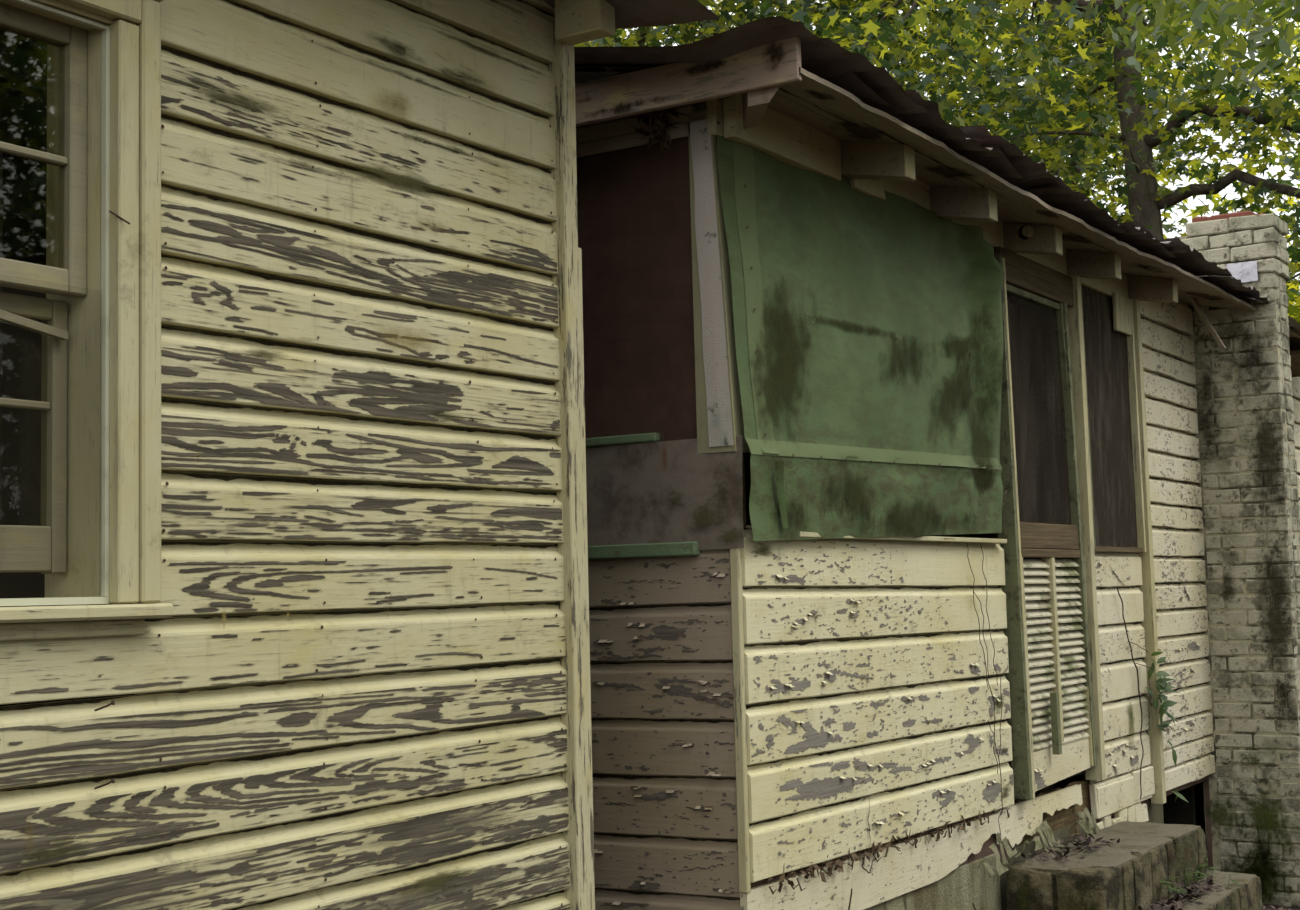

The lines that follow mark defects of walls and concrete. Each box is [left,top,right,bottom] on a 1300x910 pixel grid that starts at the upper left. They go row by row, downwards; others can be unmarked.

peeling [161,62,505,193]
peeling [161,192,558,323]
peeling [161,270,559,367]
peeling [161,346,560,433]
peeling [161,415,561,488]
peeling [161,491,562,541]
peeling [169,561,453,612]
peeling [0,673,566,787]
peeling [283,630,515,678]
peeling [750,541,1013,869]
peeling [0,729,568,872]
peeling [0,788,570,910]